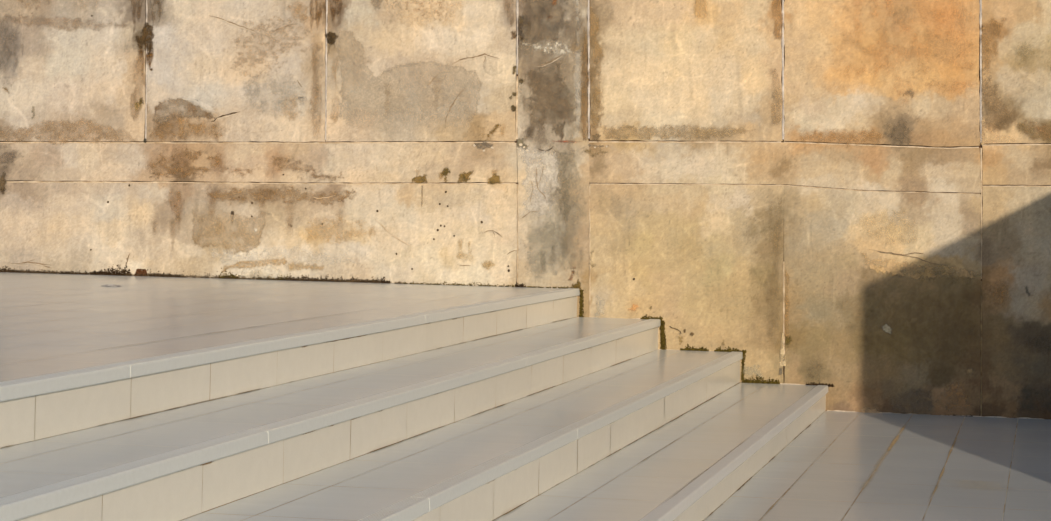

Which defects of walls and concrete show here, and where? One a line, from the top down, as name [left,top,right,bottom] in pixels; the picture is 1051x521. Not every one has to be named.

damp [133,92,222,178]
damp [505,0,745,291]